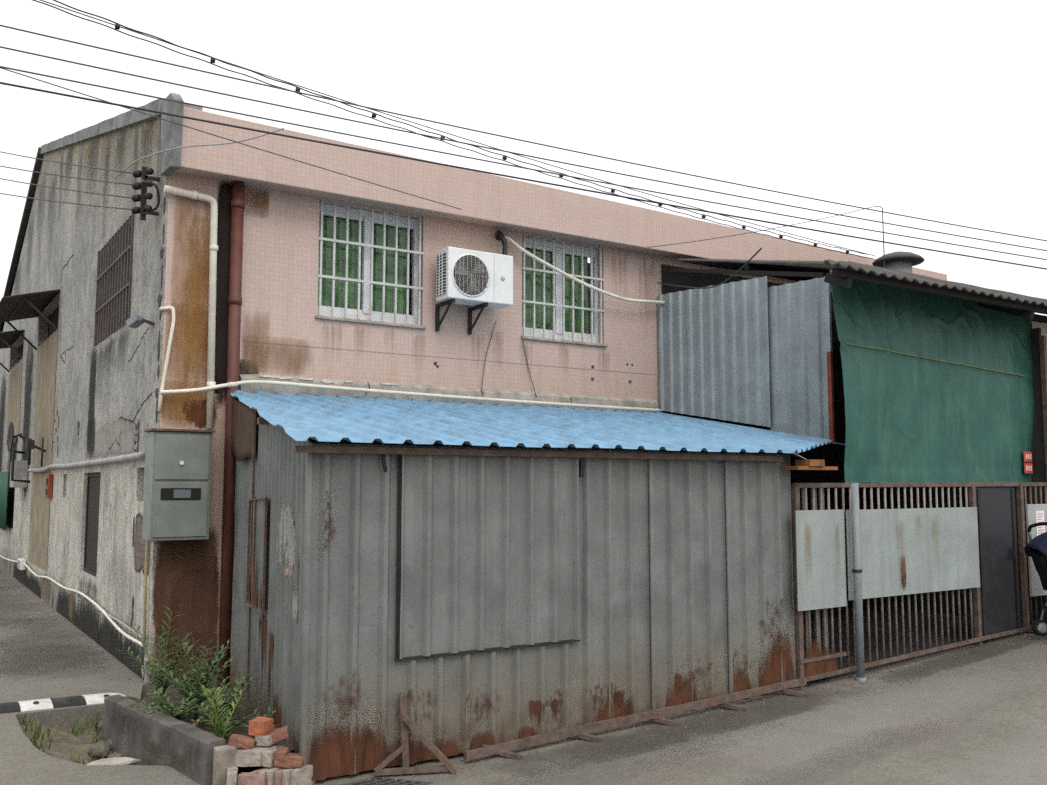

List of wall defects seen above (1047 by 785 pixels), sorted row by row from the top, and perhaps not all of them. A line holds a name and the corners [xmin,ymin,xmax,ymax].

water stain [87,340,126,456]
crack [101,392,152,454]
flaking render [132,512,150,575]
water stain [13,566,145,680]
rust [248,554,297,753]
rust [310,731,459,781]
rust [471,733,495,749]
rust [518,693,560,739]
rust [590,683,634,721]